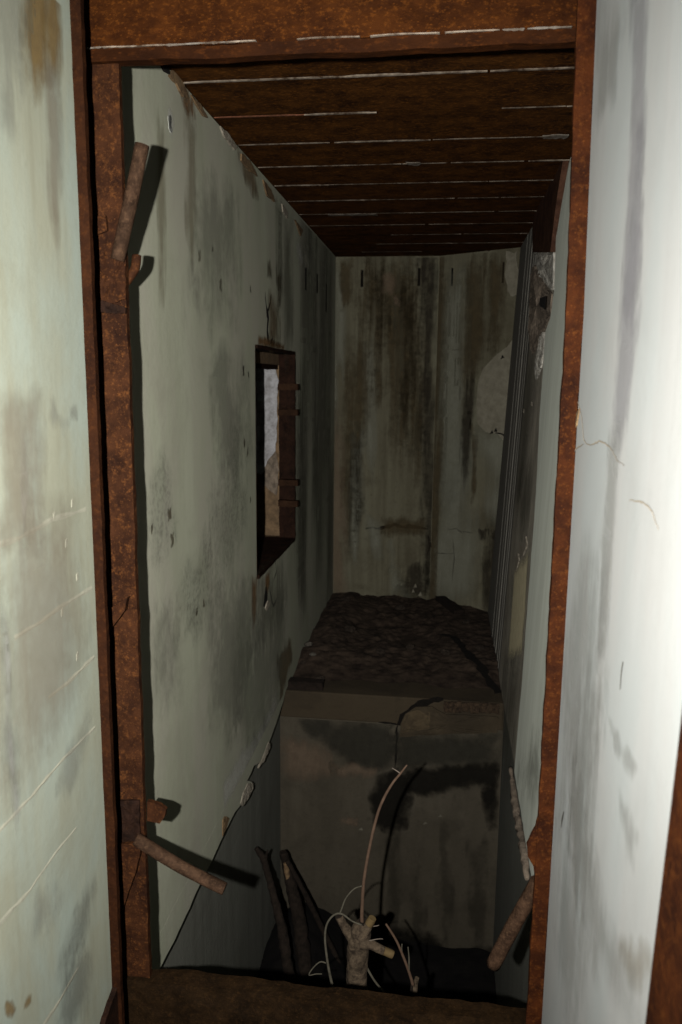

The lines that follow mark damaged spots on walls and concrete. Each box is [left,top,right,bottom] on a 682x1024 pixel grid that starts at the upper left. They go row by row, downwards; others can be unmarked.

spalling [505,251,556,380]
damp [288,199,537,603]
crack [629,499,659,530]
damp [288,720,499,831]
crack [379,697,443,769]